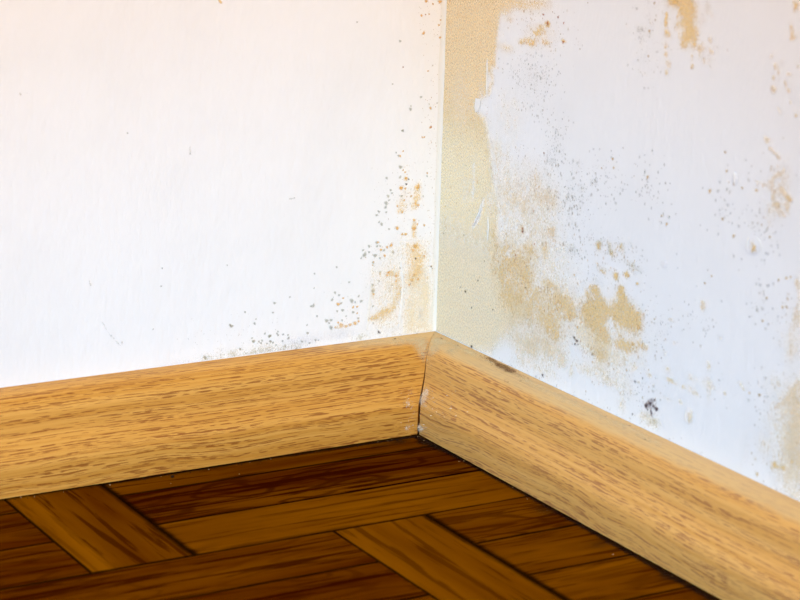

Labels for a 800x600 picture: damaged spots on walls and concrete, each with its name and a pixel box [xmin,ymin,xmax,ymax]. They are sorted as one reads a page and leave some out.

damp [370,0,657,384]